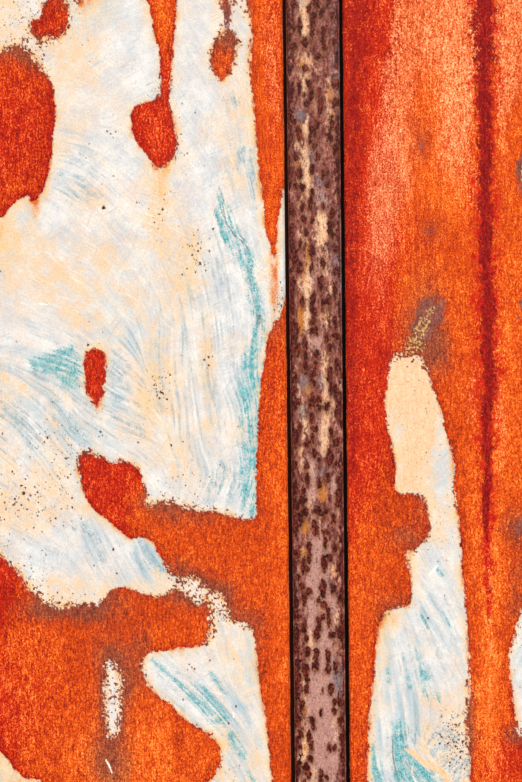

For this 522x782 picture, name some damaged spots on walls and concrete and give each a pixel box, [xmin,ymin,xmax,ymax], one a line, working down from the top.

rust [0,0,345,782]
rust [286,0,522,782]